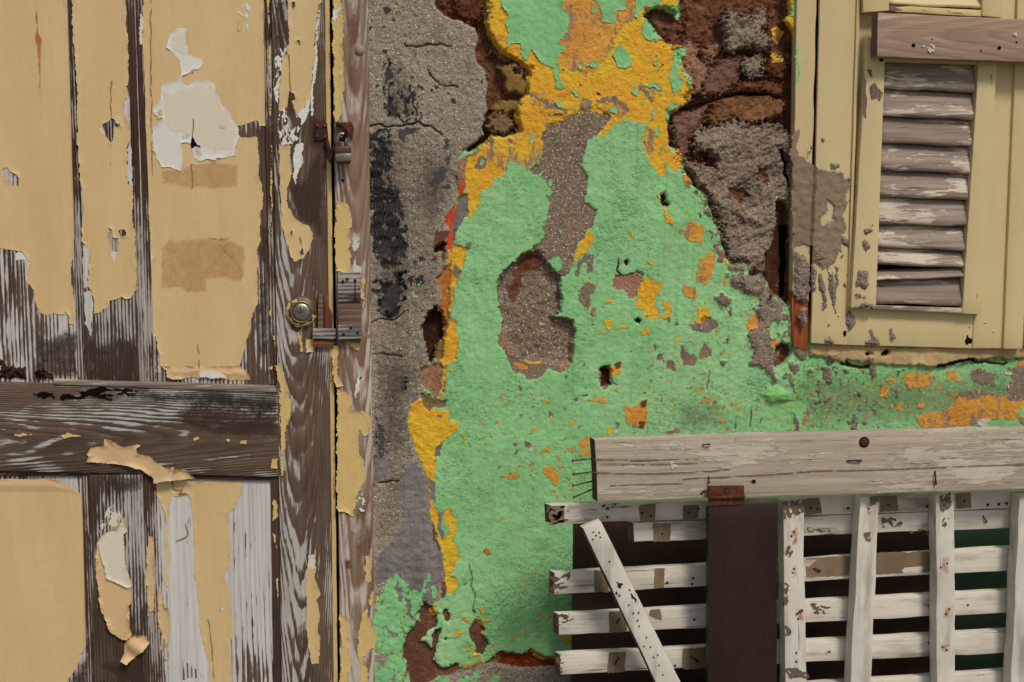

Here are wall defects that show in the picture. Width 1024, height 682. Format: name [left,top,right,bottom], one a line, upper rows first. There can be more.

crack [404,43,458,88]
crack [369,115,443,135]
peeling [0,0,137,325]
peeling [142,0,266,381]
crack [779,149,790,187]
peeling [331,0,1024,682]
crack [840,359,870,369]
crack [936,358,1008,367]
peeling [0,439,242,682]